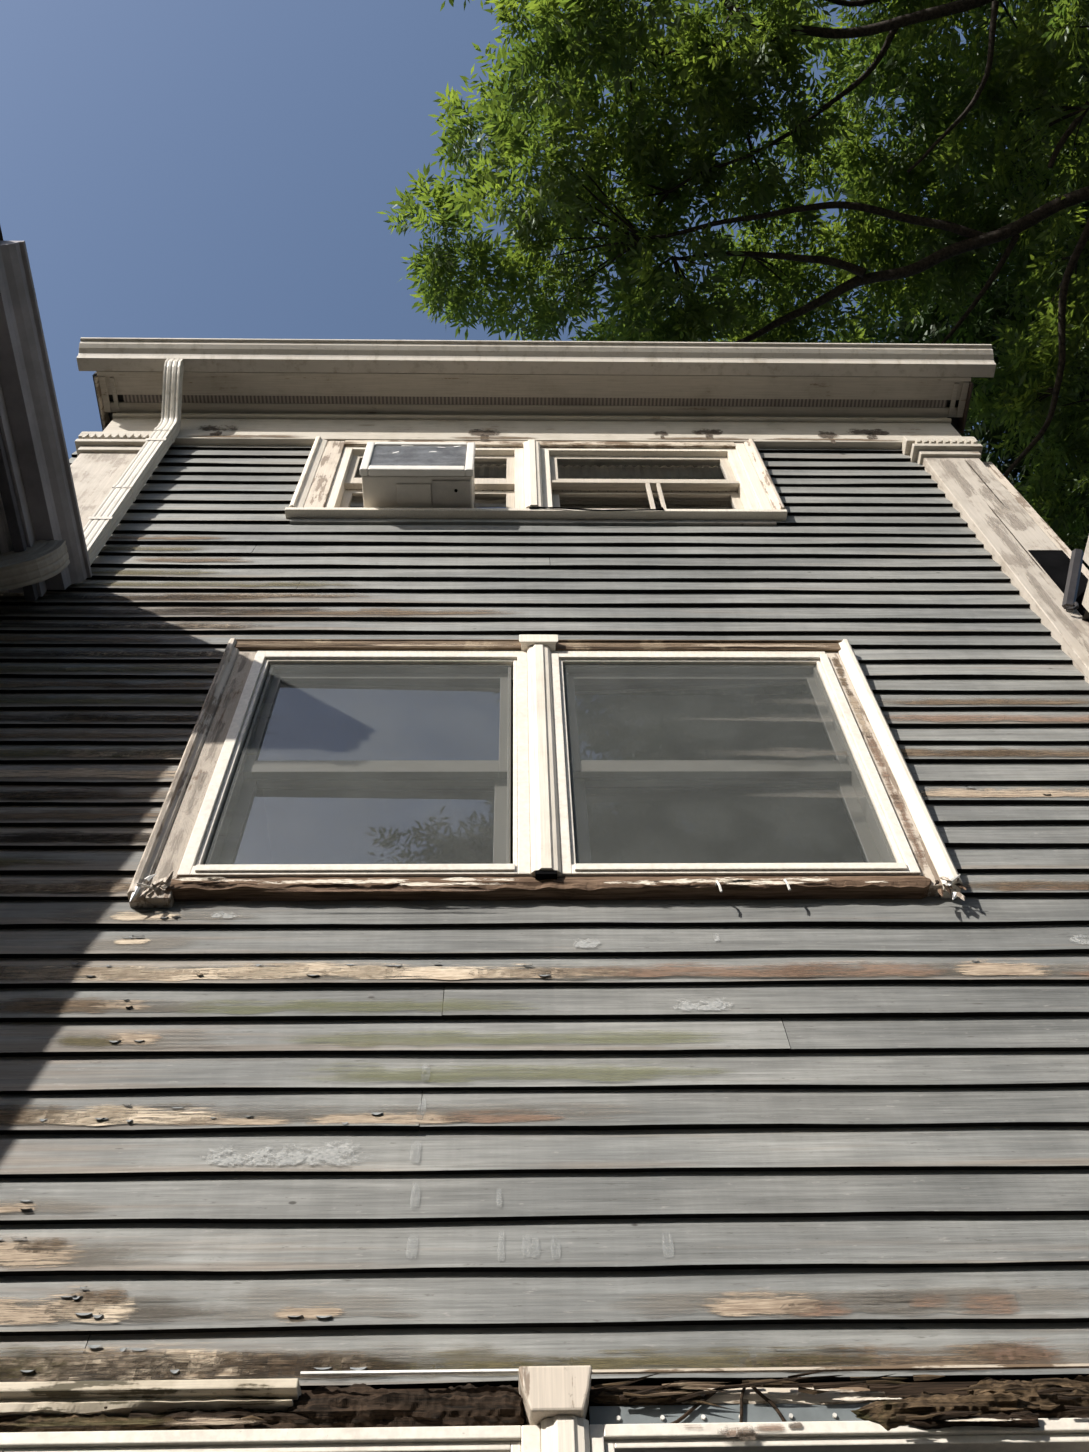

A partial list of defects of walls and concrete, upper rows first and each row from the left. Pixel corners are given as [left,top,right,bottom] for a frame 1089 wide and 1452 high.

peeling [134,643,514,892]
peeling [605,876,830,885]
peeling [962,881,1089,891]
peeling [0,909,1089,1013]
peeling [57,1032,196,1047]
peeling [0,1104,611,1126]
peeling [208,1143,353,1166]
peeling [0,1237,140,1269]
peeling [0,1286,201,1325]
peeling [0,1345,422,1382]
water stain [0,1343,1051,1382]
peeling [17,1417,253,1426]